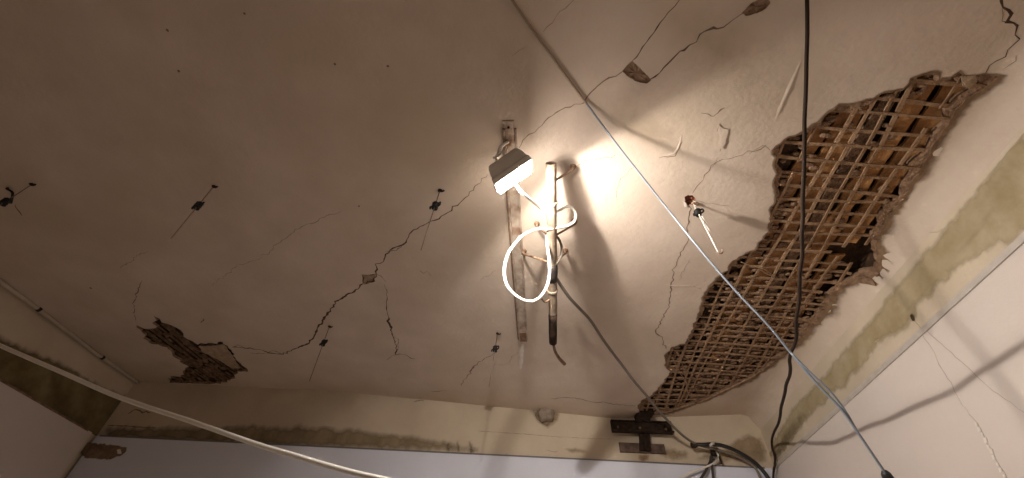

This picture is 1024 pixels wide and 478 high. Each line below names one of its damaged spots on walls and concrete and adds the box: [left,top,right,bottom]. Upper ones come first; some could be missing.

crack [519,1,743,148]
spalling [622,61,651,83]
crack [986,0,1020,73]
spalling [136,316,248,384]
crack [234,176,487,360]
crack [655,145,770,347]
spalling [638,70,1006,415]
leakage [721,139,1024,460]
spalling [81,442,126,459]